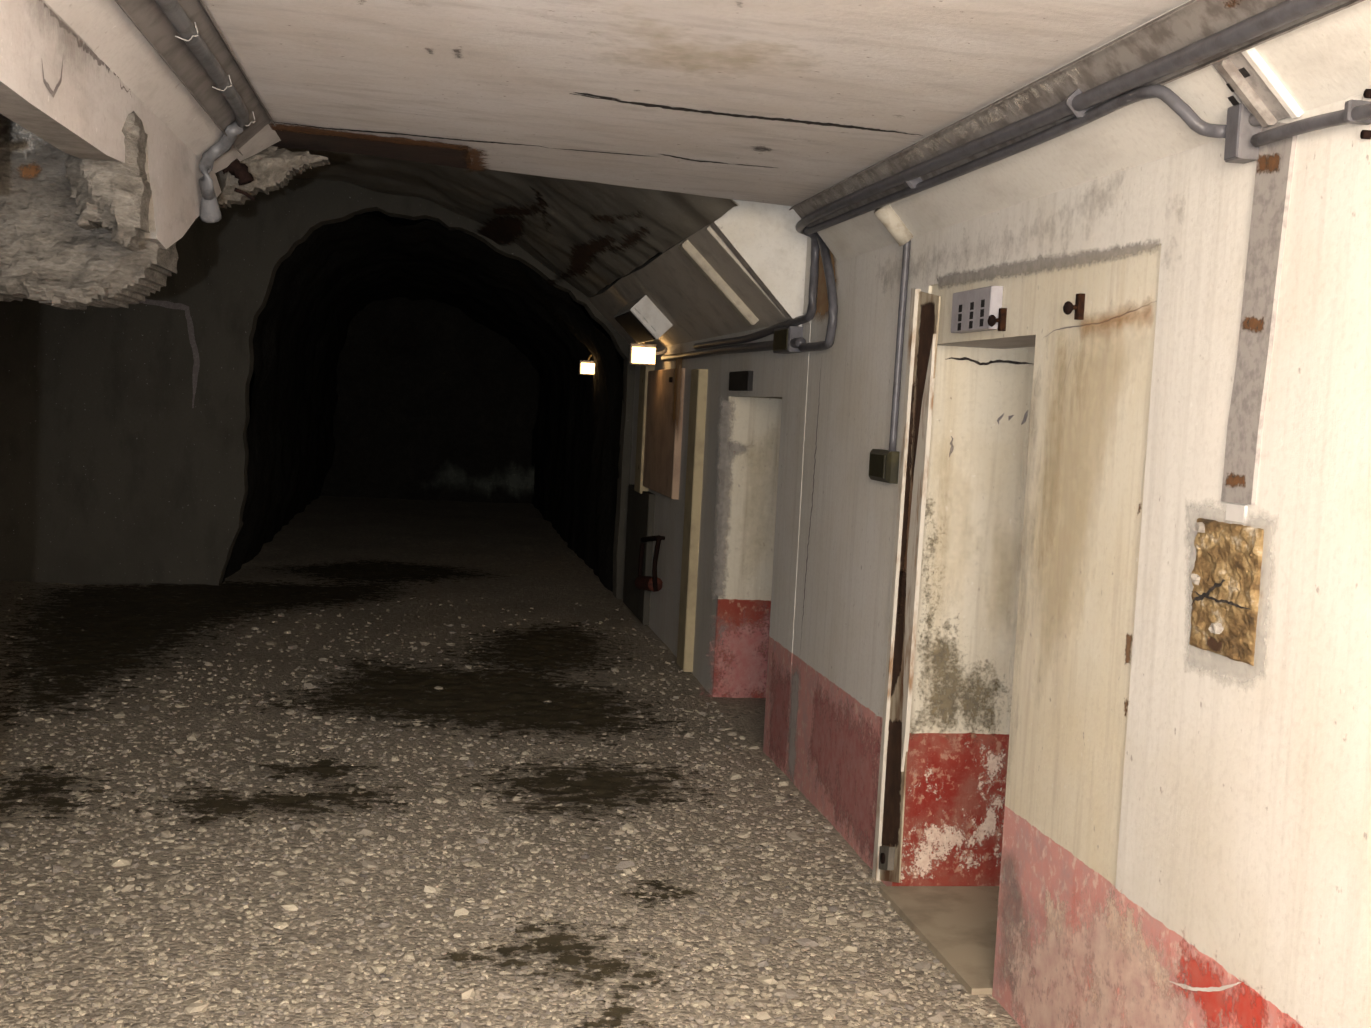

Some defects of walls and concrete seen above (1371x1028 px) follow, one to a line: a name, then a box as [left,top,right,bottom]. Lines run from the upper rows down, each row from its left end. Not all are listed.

crack [570,92,923,136]
spalling [0,112,178,310]
spalling [216,146,330,209]
corrosion [475,186,551,246]
corrosion [547,212,650,287]
mould [911,615,1000,734]
peeling [901,743,1006,882]